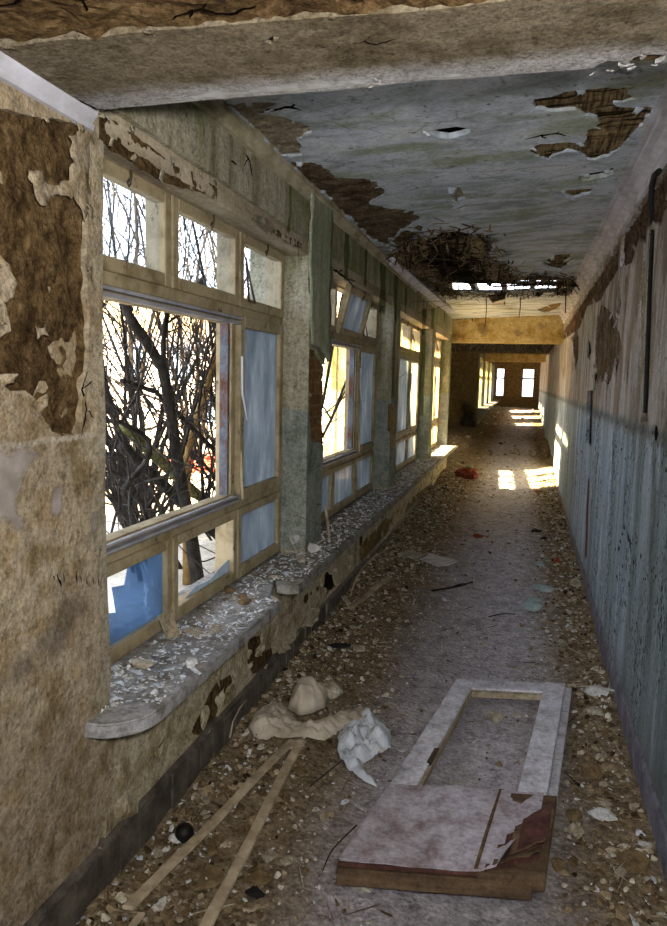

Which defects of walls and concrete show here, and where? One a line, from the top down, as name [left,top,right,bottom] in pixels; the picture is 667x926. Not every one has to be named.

crack [172,3,257,20]
spalling [589,54,662,76]
flaking render [99,114,217,199]
flaking render [228,101,423,248]
flaking render [525,85,651,158]
flaking render [0,110,93,434]
flaking render [544,254,575,272]
flaking render [561,168,667,392]